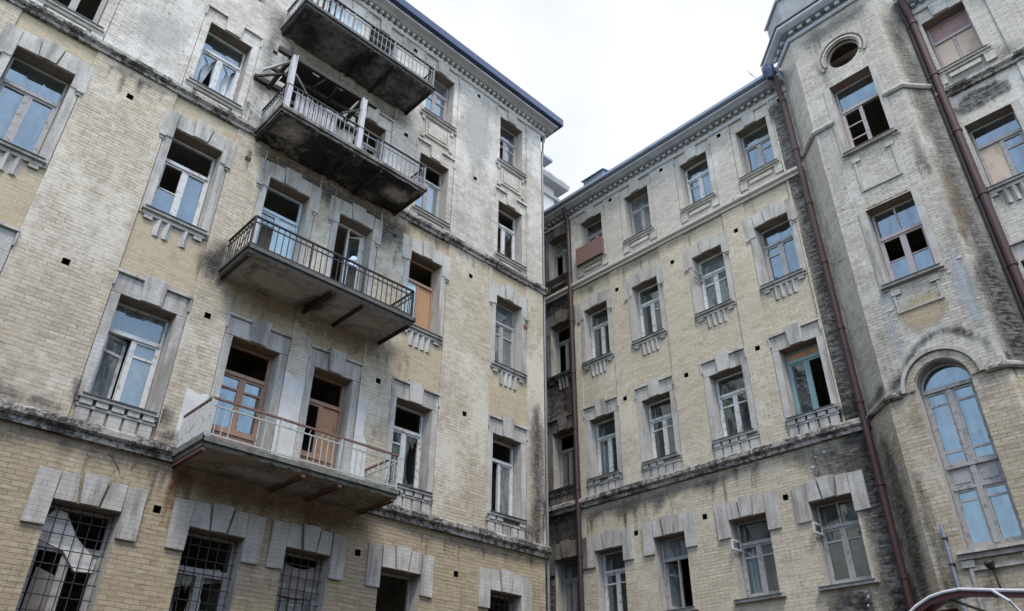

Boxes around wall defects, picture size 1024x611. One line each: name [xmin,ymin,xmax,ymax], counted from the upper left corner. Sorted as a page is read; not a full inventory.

leakage [494,408,571,544]
leakage [794,440,858,488]